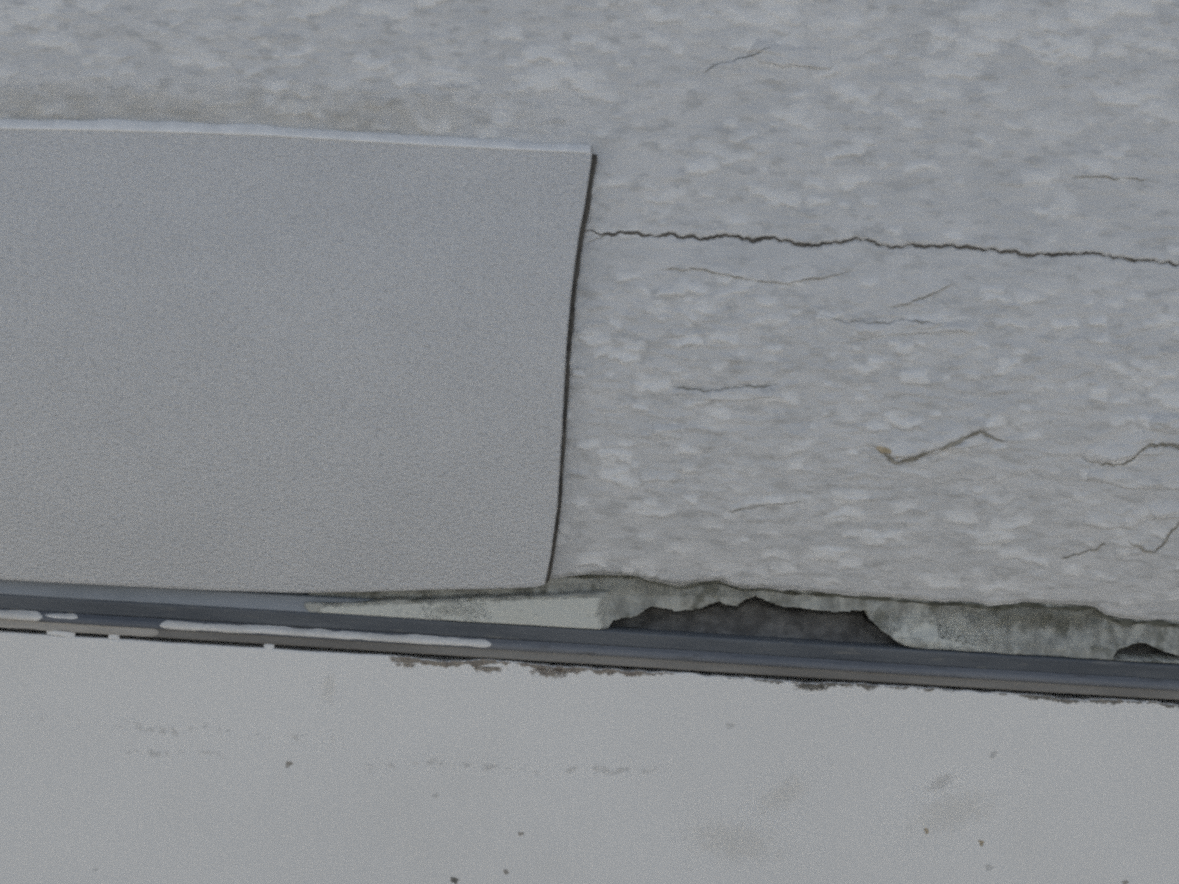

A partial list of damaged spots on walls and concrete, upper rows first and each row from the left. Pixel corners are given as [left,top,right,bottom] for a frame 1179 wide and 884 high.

crack [546,154,1179,627]
spalling [610,595,901,644]
hole [1116,642,1168,655]